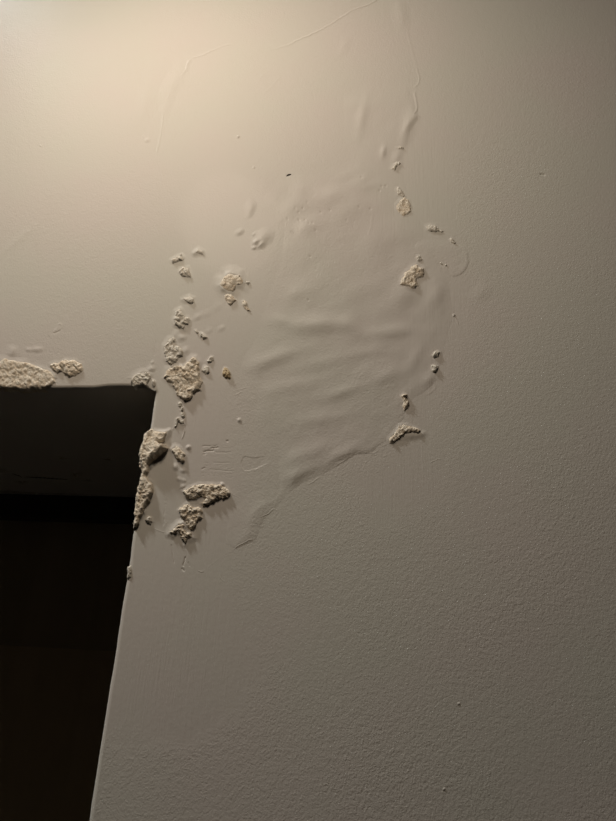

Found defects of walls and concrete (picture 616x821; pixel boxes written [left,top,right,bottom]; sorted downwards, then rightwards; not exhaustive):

spalling [168,245,207,280]
spalling [211,263,252,314]
spalling [397,254,428,292]
spalling [0,354,85,393]
spalling [430,349,442,374]
spalling [126,293,232,531]
spalling [386,392,429,446]
spalling [164,481,233,549]